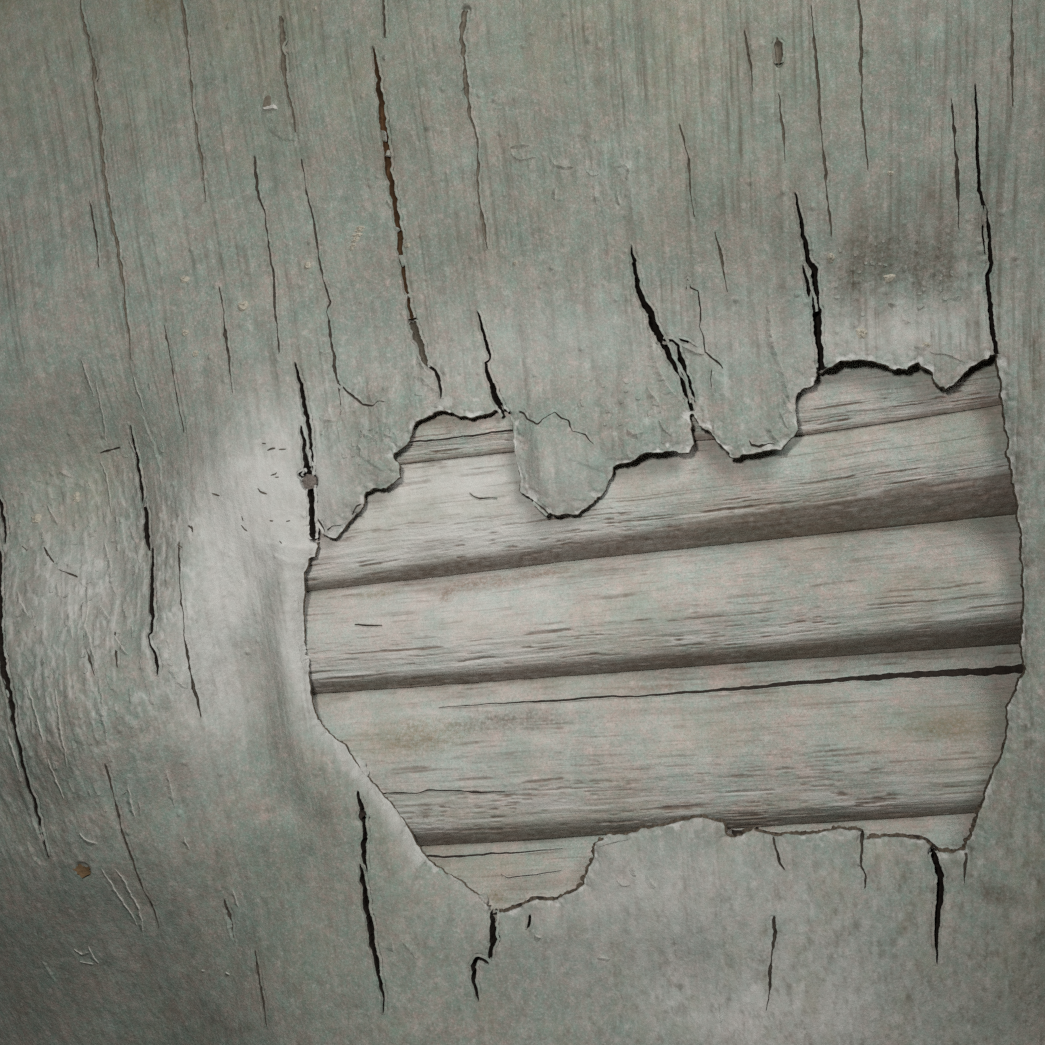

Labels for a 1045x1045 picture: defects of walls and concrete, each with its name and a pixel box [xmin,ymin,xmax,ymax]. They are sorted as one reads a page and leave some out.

crack [241,155,363,544]
crack [299,158,386,409]
crack [370,0,445,399]
crack [628,122,731,411]
crack [741,3,835,370]
crack [854,0,871,172]
crack [0,491,120,859]
crack [98,425,205,719]
spalling [303,305,1026,913]
crack [354,788,505,1014]
crack [426,847,584,1002]
crack [857,832,971,965]